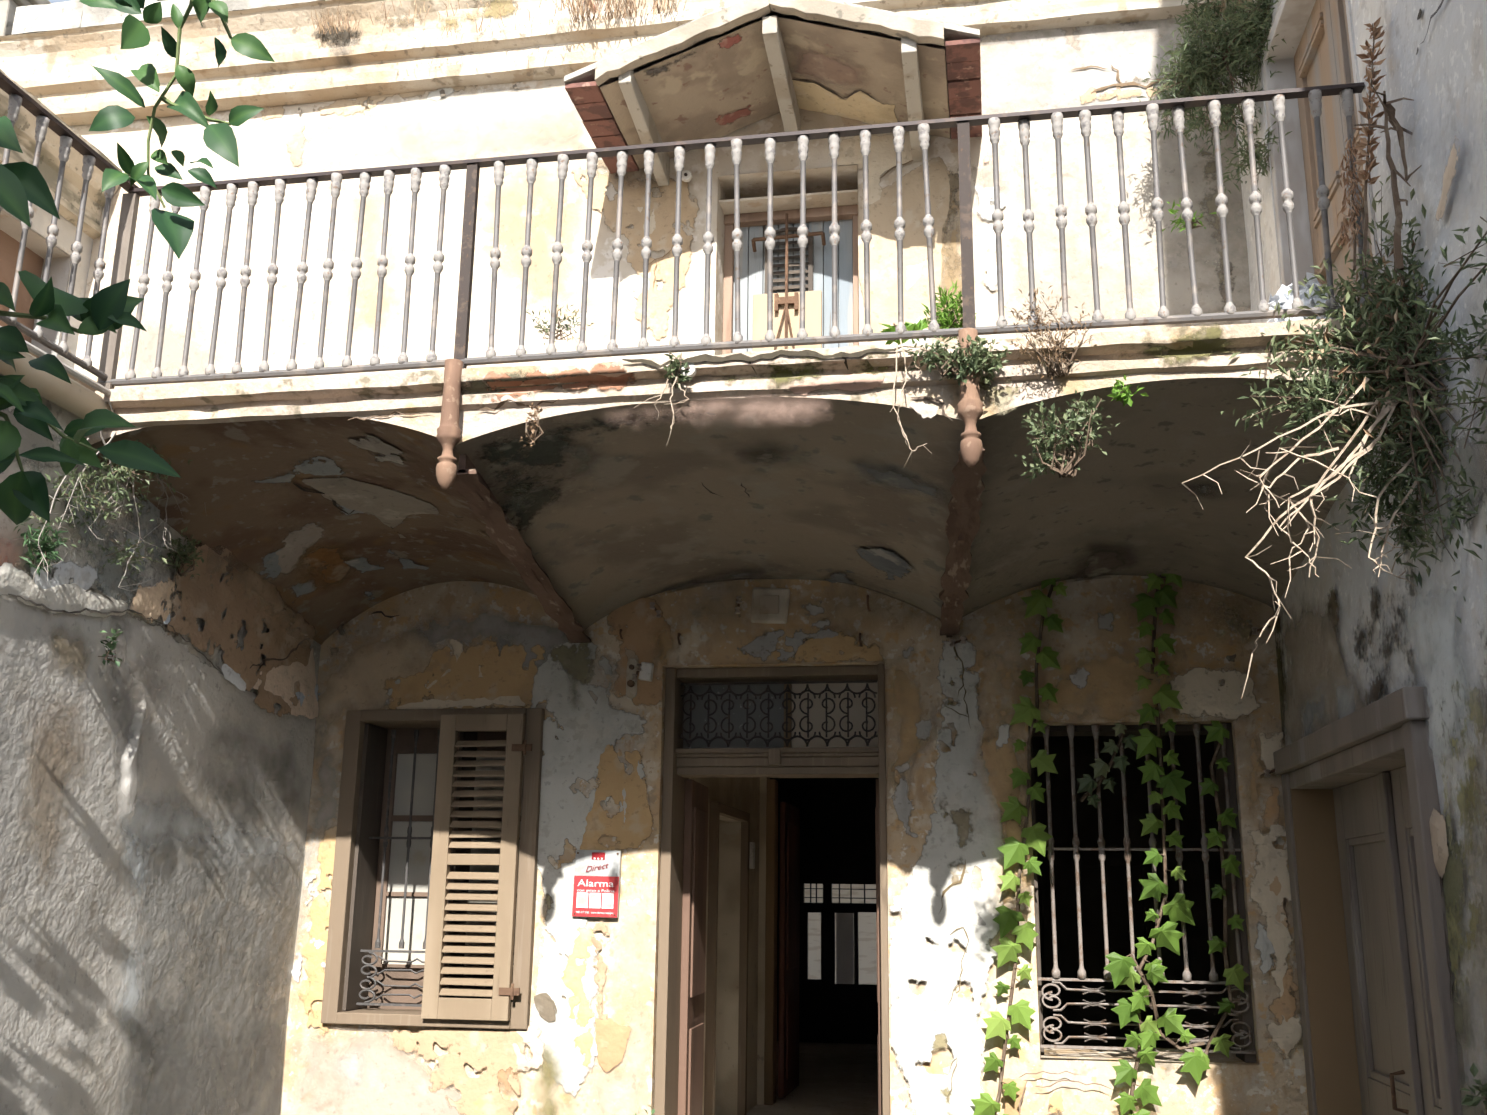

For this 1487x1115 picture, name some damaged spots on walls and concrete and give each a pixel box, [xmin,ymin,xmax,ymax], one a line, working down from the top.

peeling [348,434,404,465]
peeling [254,456,462,573]
peeling [164,523,325,719]
peeling [386,639,525,709]
peeling [1169,654,1260,721]
peeling [996,724,1010,747]
water stain [1443,733,1484,951]
peeling [890,889,908,912]
peeling [1248,732,1302,1059]
spalling [568,921,631,1072]
water stain [136,1028,280,1115]